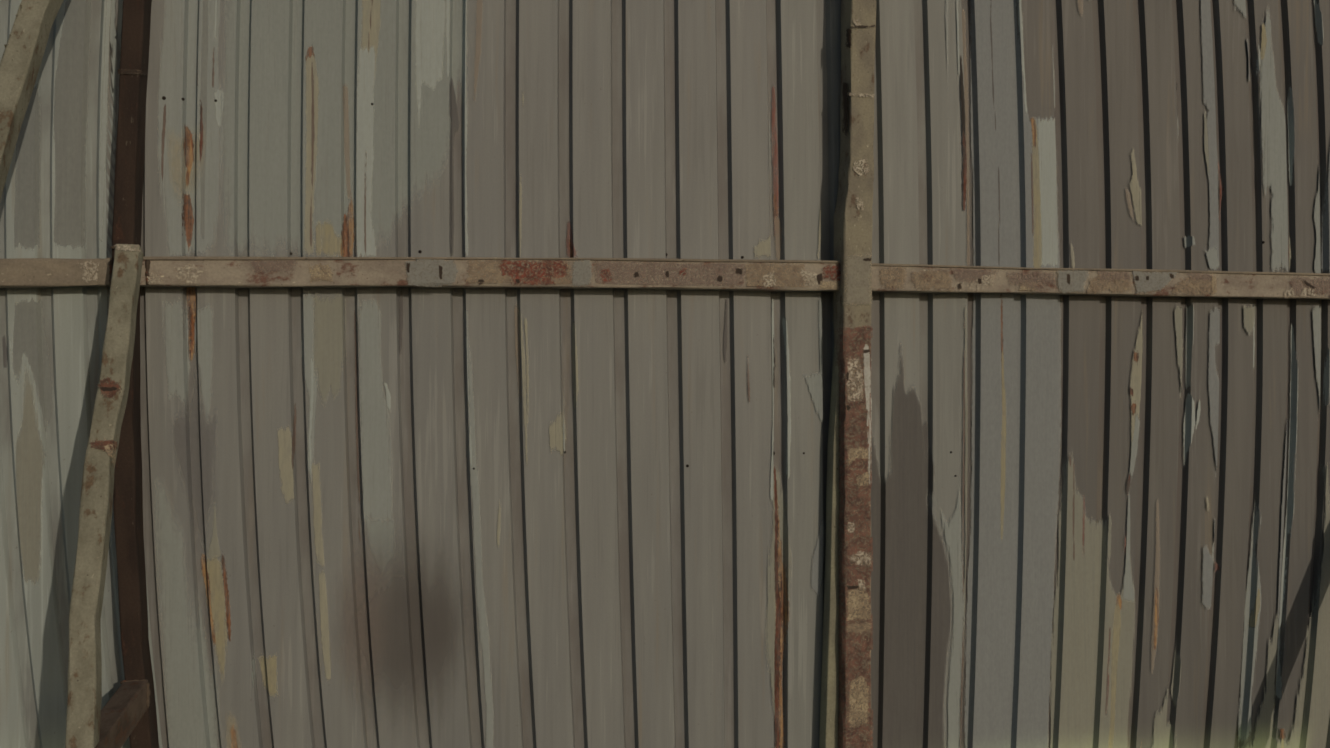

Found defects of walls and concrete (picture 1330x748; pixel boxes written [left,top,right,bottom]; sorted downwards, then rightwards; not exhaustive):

corrosion [181,50,214,251]
corrosion [304,46,319,255]
corrosion [466,221,576,289]
peeling [1175,303,1220,475]
peeling [1184,0,1219,269]
peeling [1244,306,1255,367]
peeling [1247,12,1330,409]
corrosion [201,551,231,675]
corrosion [766,298,792,748]
peeling [1154,651,1181,748]
peeling [1202,498,1219,608]
peeling [1238,325,1330,748]